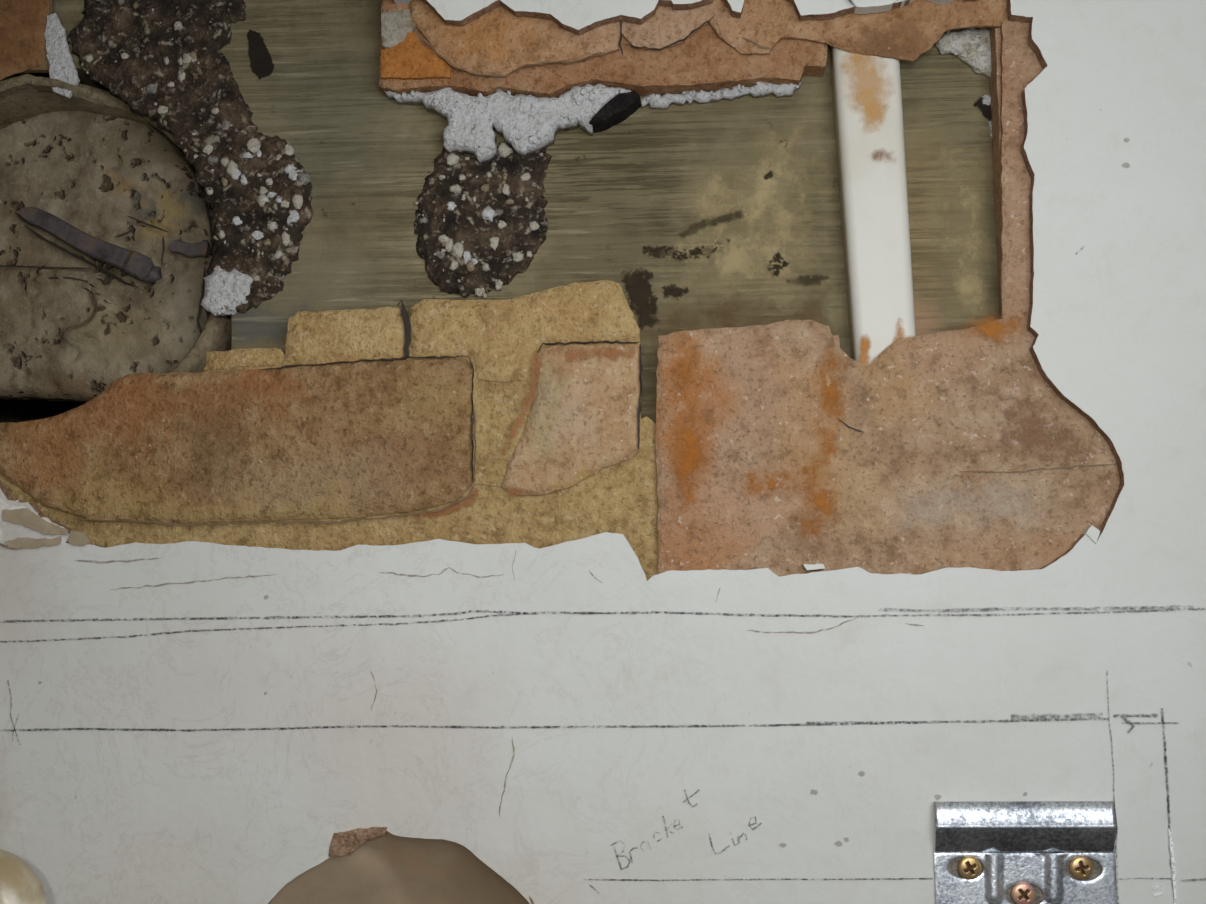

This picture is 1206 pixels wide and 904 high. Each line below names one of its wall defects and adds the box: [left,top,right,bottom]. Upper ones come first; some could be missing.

flaking render [17,43,49,74]
peeling [117,0,200,126]
peeling [211,108,247,131]
peeling [180,124,311,286]
flaking render [379,0,1120,577]
peeling [0,498,91,549]
peeling [328,827,387,857]